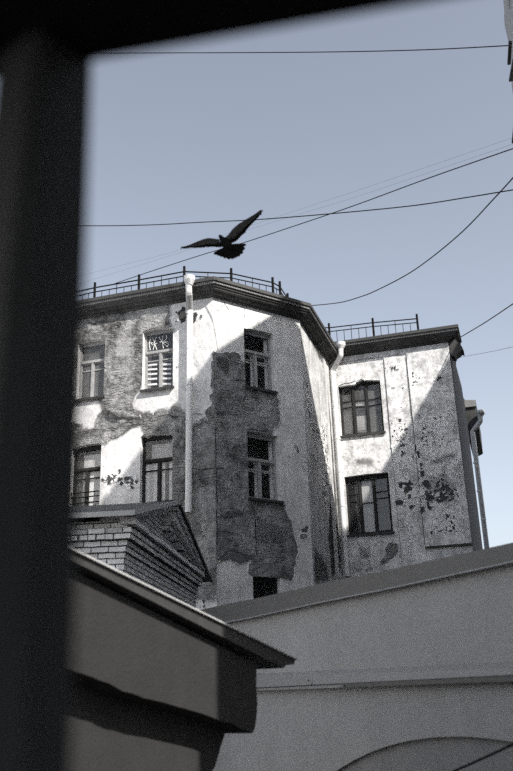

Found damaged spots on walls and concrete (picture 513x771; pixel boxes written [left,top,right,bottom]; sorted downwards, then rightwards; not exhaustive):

flaking render [81,305,309,608]
peeling [391,372,441,390]
peeling [380,403,464,564]